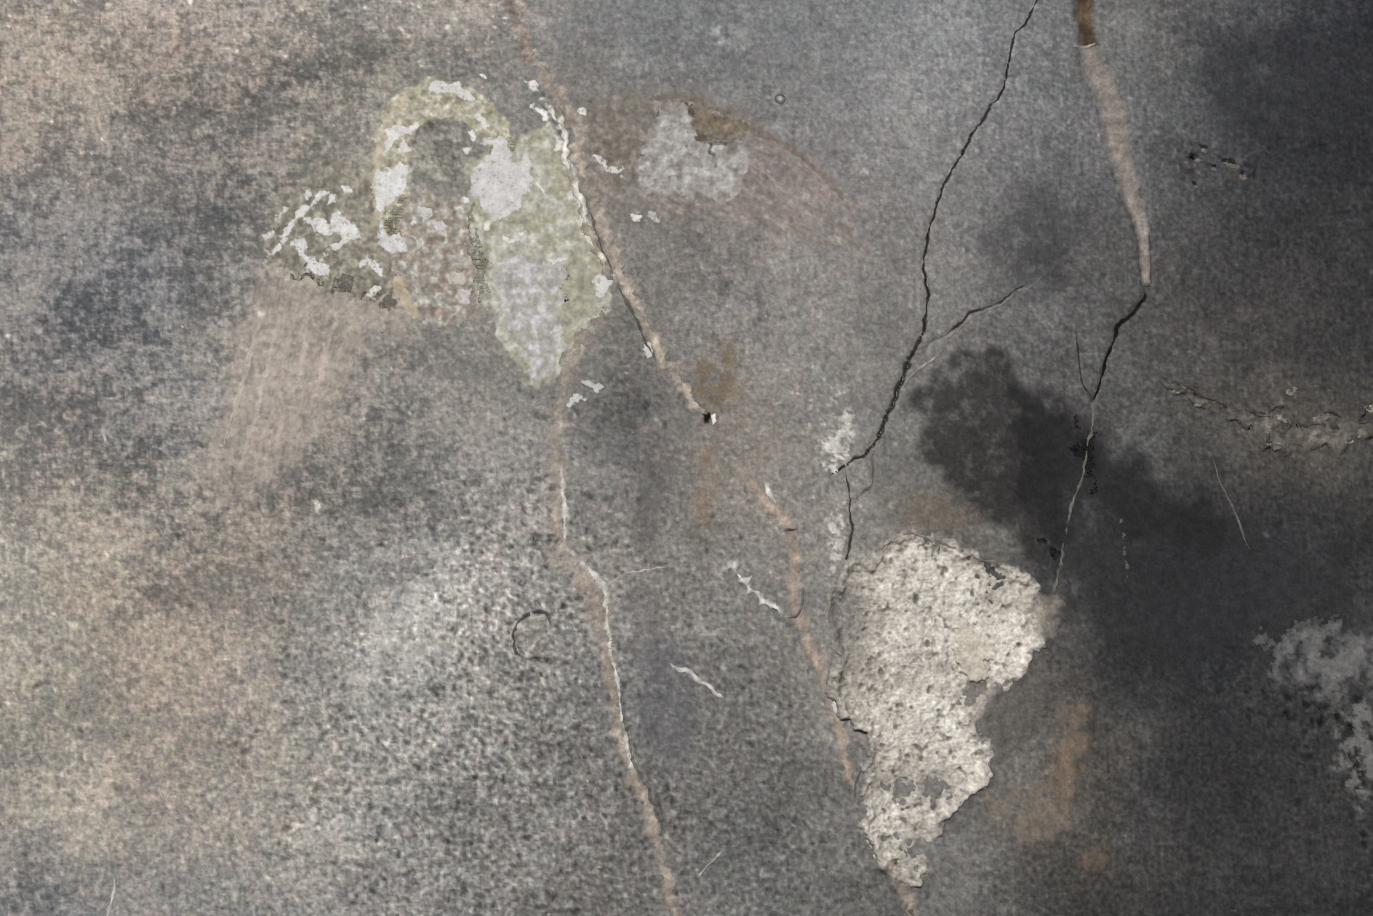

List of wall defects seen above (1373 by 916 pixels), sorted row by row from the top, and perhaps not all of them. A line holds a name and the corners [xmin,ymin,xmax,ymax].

peeling [259,122,449,299]
peeling [428,79,546,245]
peeling [523,79,566,152]
peeling [566,379,610,409]
crack [499,0,705,916]
peeling [591,272,616,299]
peeling [592,154,625,179]
crack [720,461,861,803]
flaking render [819,528,1067,916]
crack [828,0,1094,560]
crack [1052,0,1152,594]
water stain [897,341,1373,705]